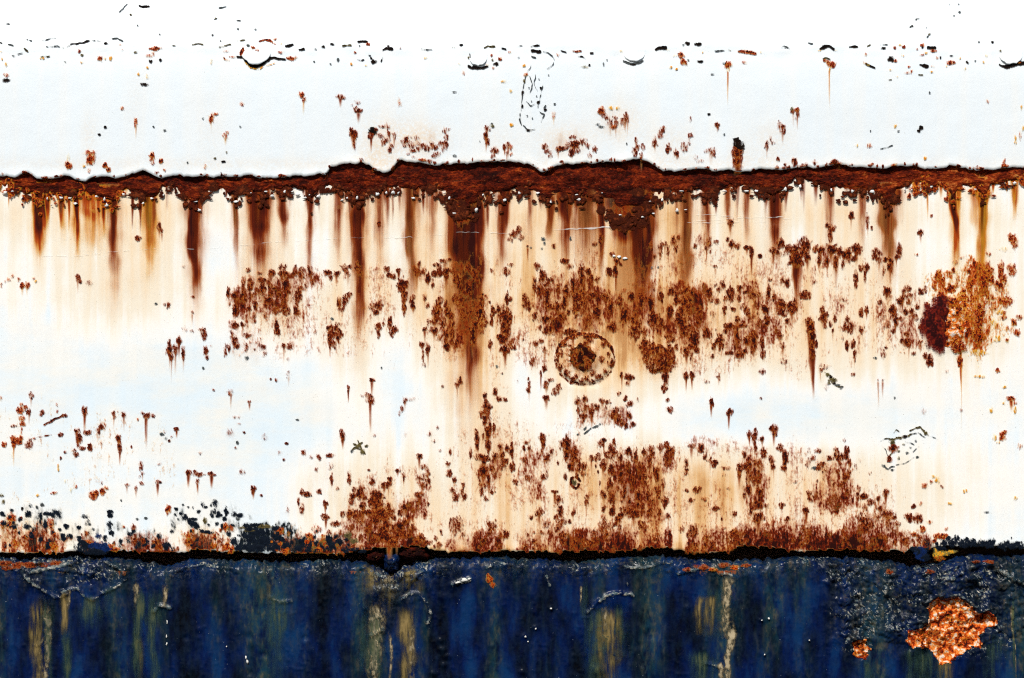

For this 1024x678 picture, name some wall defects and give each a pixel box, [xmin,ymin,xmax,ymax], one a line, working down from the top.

peeling [240,47,272,65]
peeling [469,54,488,66]
peeling [623,50,645,61]
peeling [999,52,1023,64]
corrosion [0,94,1024,573]
peeling [0,494,171,555]
peeling [171,499,366,553]
corrosion [906,597,998,665]